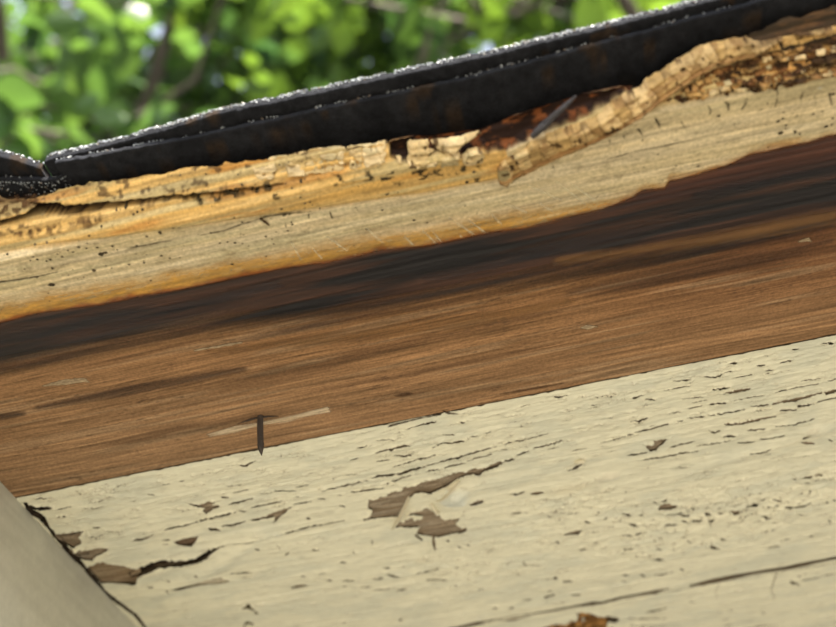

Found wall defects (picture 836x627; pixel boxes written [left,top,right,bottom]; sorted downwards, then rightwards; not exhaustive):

peeling [709,80,747,97]
spalling [252,140,387,180]
spalling [396,130,485,169]
leakage [0,111,836,372]
crack [635,362,836,459]
crack [24,496,146,627]
peeling [55,531,141,582]
peeling [191,501,218,512]
crack [129,411,491,577]
peeling [368,461,501,550]
crack [494,577,577,621]
crack [612,474,835,576]